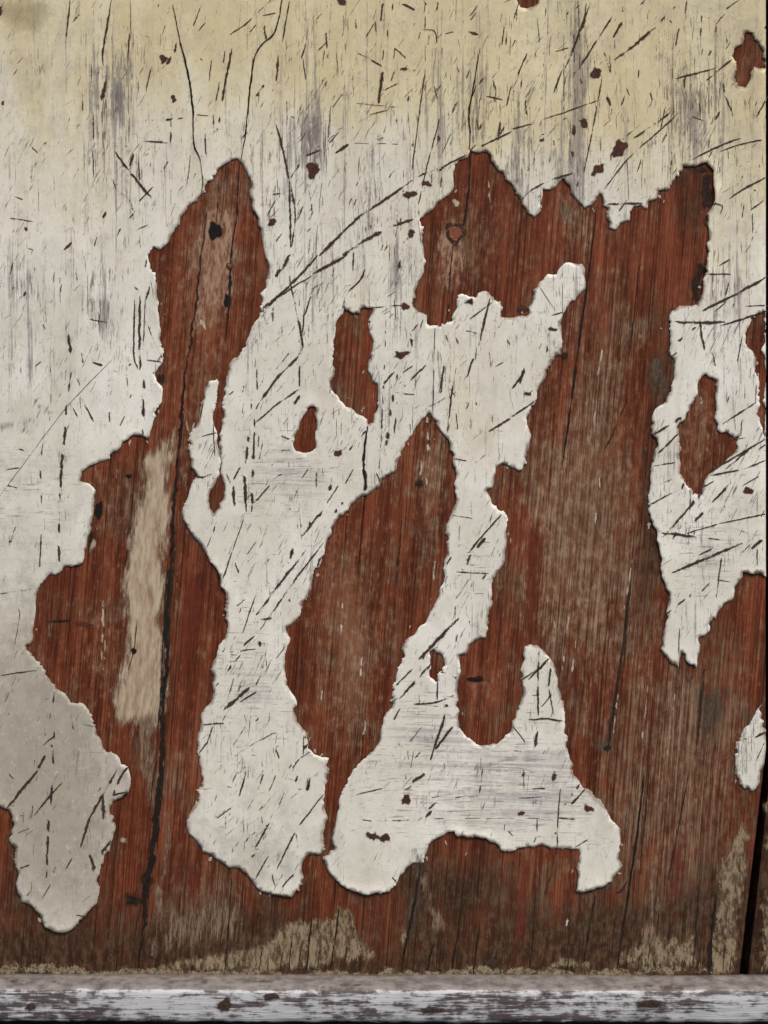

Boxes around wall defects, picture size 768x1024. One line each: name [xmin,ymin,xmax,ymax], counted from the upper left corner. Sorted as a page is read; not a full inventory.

crack [130,0,283,970]
peeling [0,159,715,975]
peeling [412,149,766,975]
peeling [591,139,628,176]
peeling [732,33,765,88]